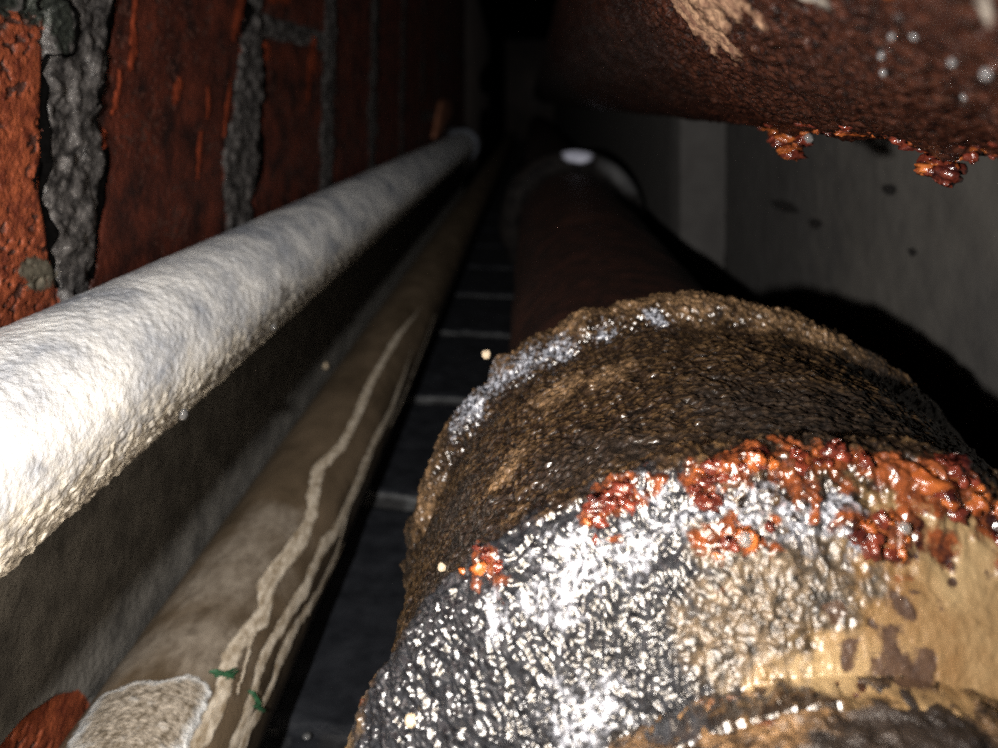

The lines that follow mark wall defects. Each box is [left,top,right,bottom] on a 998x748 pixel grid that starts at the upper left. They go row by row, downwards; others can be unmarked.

corrosion [756,122,853,161]
corrosion [866,132,998,188]
corrosion [458,544,503,576]
corrosion [581,478,640,546]
corrosion [713,520,776,560]
corrosion [687,439,875,515]
corrosion [847,509,913,564]
corrosion [911,452,998,527]